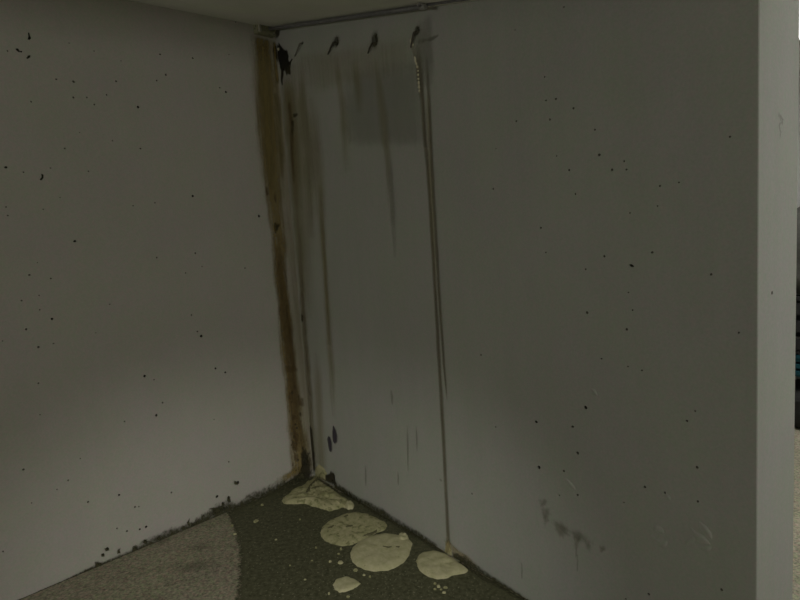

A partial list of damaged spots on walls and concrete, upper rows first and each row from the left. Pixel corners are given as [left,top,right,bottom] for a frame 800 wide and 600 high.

water stain [19,56,528,600]
rust [255,38,315,474]